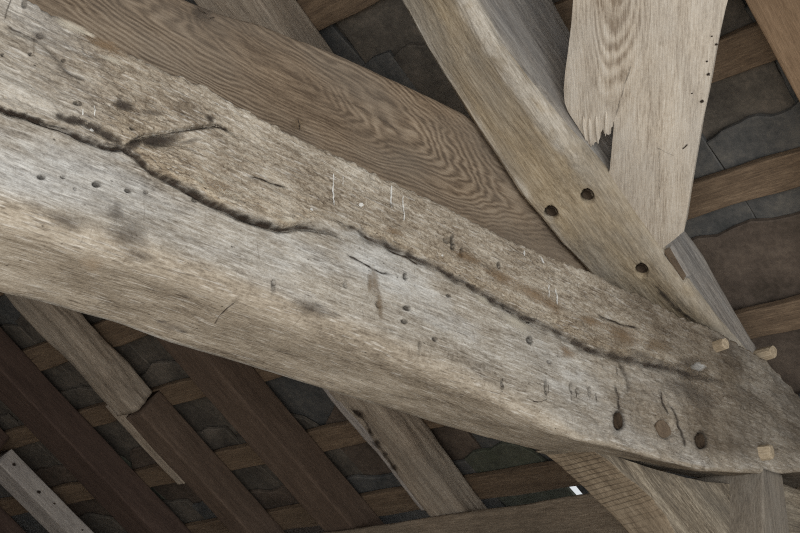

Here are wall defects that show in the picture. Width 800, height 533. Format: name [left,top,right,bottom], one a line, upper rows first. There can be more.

crack [0,108,308,232]
crack [338,221,535,323]
crack [552,330,696,377]